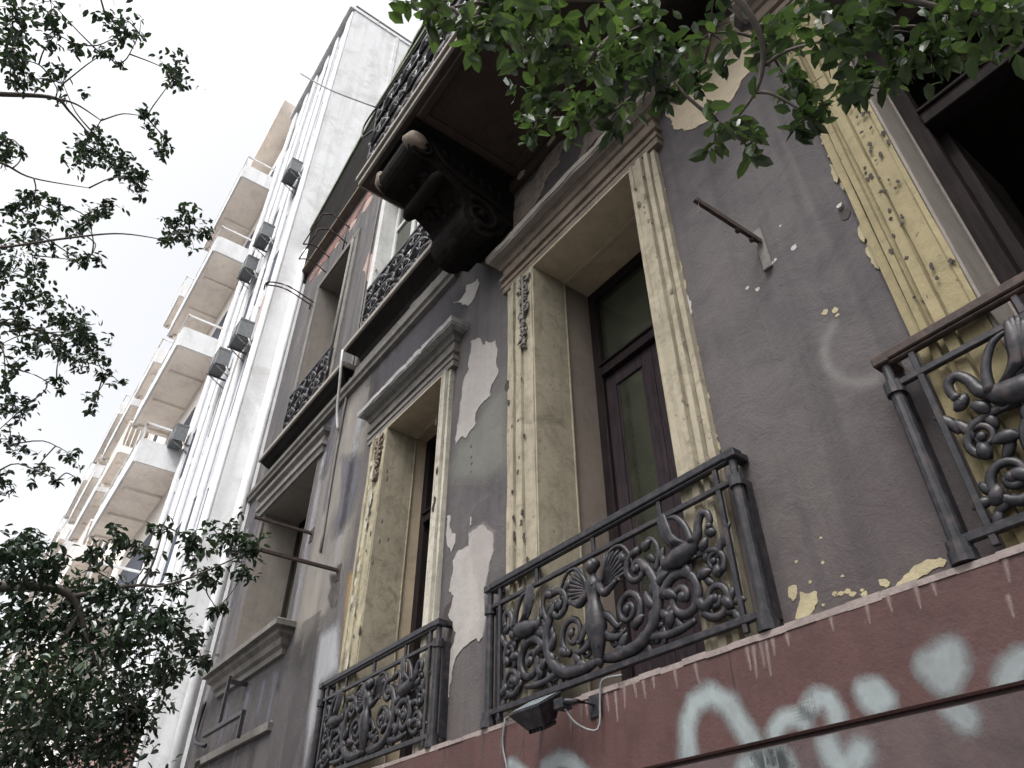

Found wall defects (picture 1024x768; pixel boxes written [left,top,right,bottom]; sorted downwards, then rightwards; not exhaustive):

peeling [665,13,754,131]
peeling [854,107,900,193]
spalling [821,142,880,270]
peeling [454,279,480,306]
peeling [455,338,522,444]
peeling [443,515,494,698]
flaking render [788,575,867,619]
flaking render [878,558,947,588]